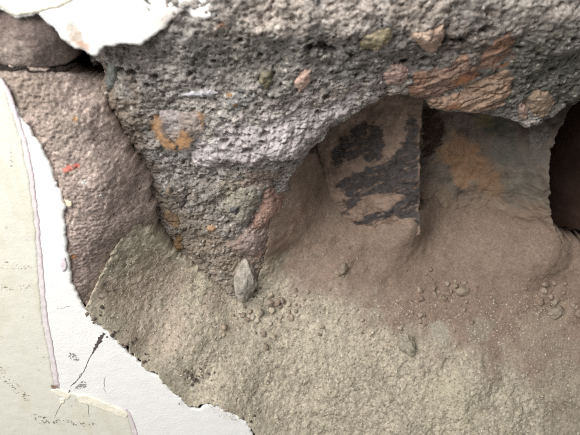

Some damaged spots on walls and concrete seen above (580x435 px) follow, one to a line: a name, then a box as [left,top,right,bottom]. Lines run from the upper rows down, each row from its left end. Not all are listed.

rust [151,116,192,151]
spalling [0,0,580,300]
water stain [336,115,422,226]
spalling [0,60,159,403]
crack [55,333,105,416]
peeling [76,394,138,435]